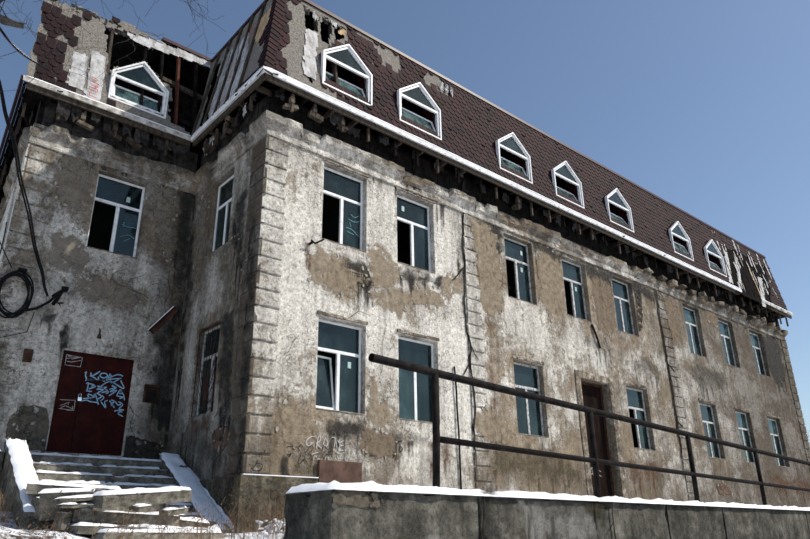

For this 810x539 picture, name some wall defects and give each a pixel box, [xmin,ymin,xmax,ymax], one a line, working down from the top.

water stain [345,258,372,308]
peeling [306,243,467,319]
peeling [470,214,505,321]
flaking render [4,403,49,451]